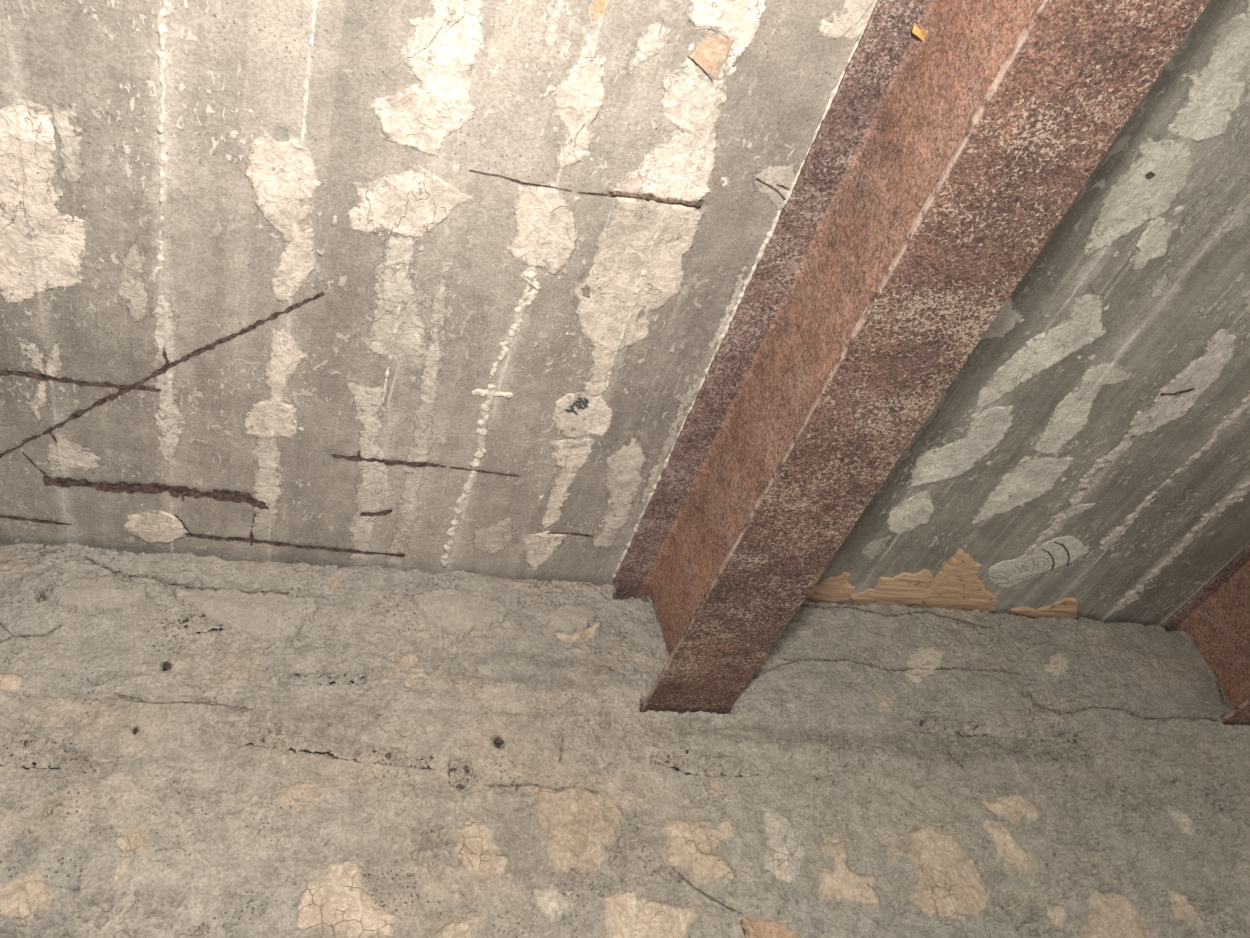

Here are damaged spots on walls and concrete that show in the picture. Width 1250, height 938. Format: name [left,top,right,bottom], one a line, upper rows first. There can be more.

spalling [0,98,186,472]
crack [0,292,405,557]
spalling [243,0,485,570]
crack [332,450,522,477]
crack [470,170,614,196]
spalling [472,0,767,572]
spalling [855,289,1138,564]
spalling [1083,0,1250,298]
spalling [1112,290,1250,440]
flaking render [293,861,398,938]
flaking render [531,783,698,938]
flaking render [905,820,994,928]